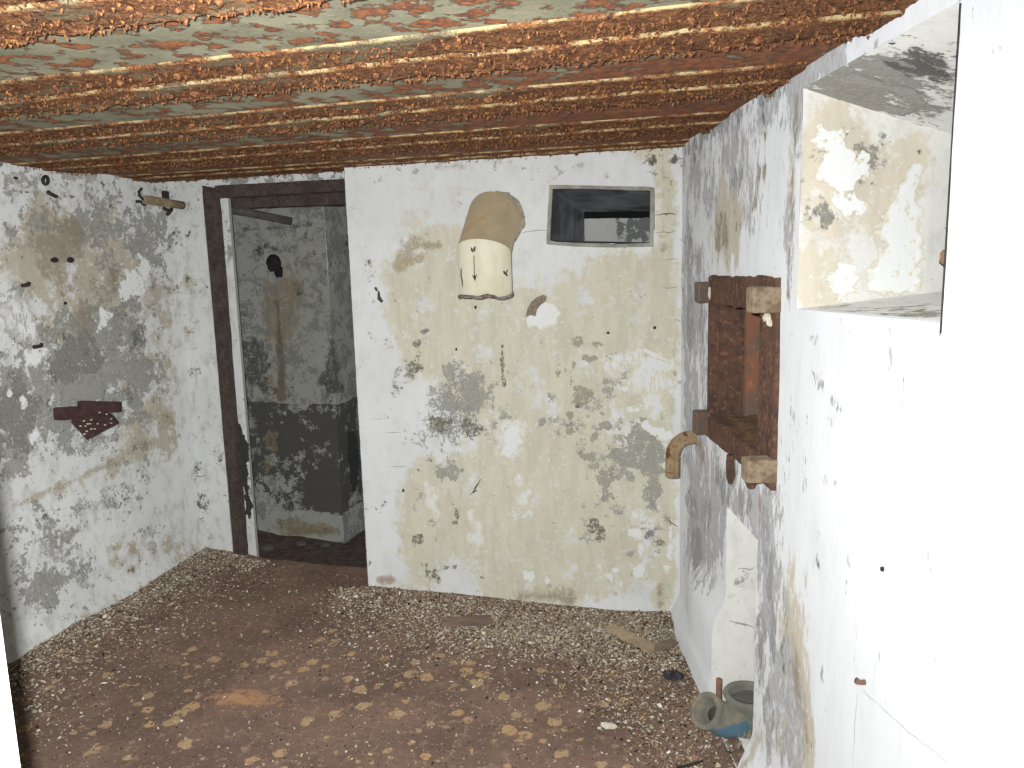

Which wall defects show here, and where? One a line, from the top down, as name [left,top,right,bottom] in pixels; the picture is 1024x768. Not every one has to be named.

peeling [117,252,152,302]
peeling [0,287,50,410]
peeling [91,304,114,333]
damp [525,302,561,332]
peeling [26,426,43,446]
peeling [61,376,112,435]
damp [347,431,360,494]
damp [429,362,536,515]
peeling [578,417,665,505]
damp [610,339,676,443]
damp [586,518,606,543]
damp [595,507,676,588]